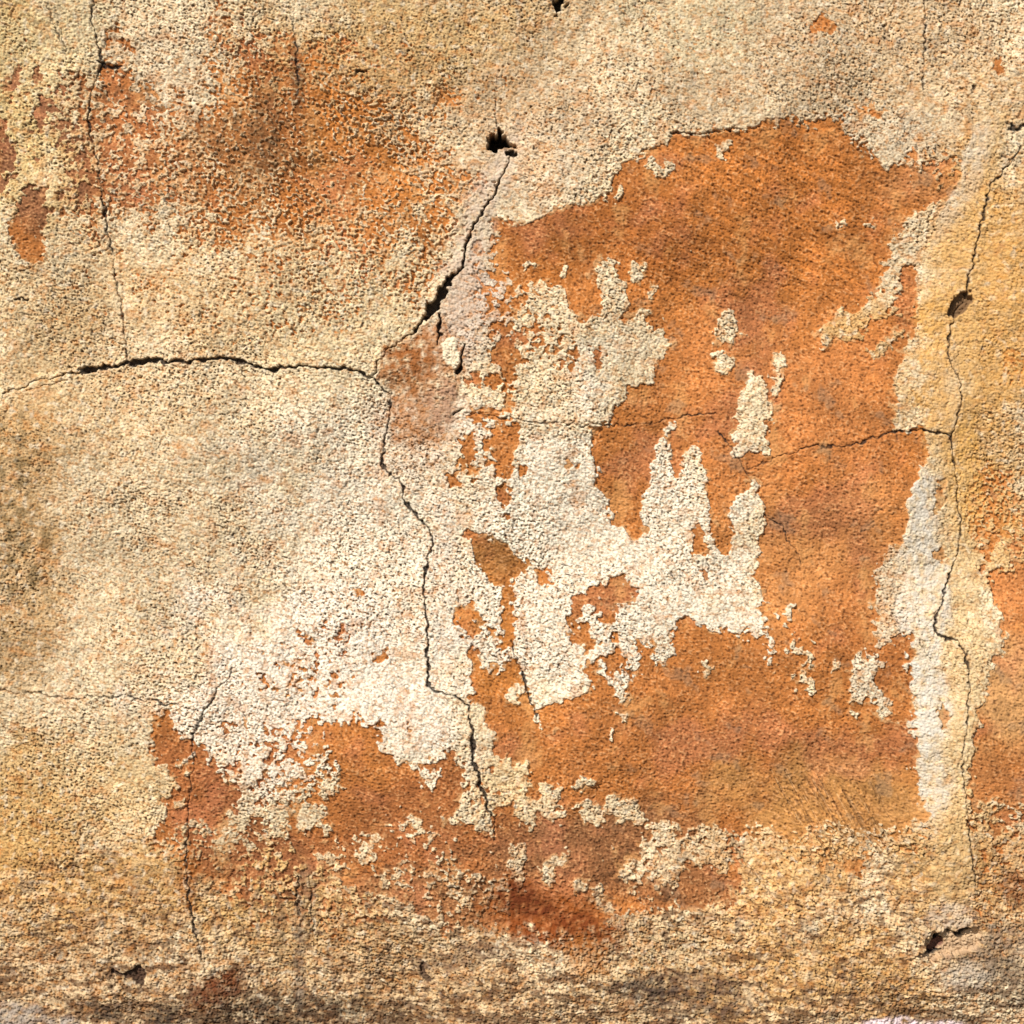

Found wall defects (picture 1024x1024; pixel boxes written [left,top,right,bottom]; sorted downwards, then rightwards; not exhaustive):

crack [0,667,235,975]
crack [4,0,510,842]
peeling [174,116,963,927]
crack [452,319,979,902]
flaking render [923,927,971,955]
crack [966,146,1022,291]